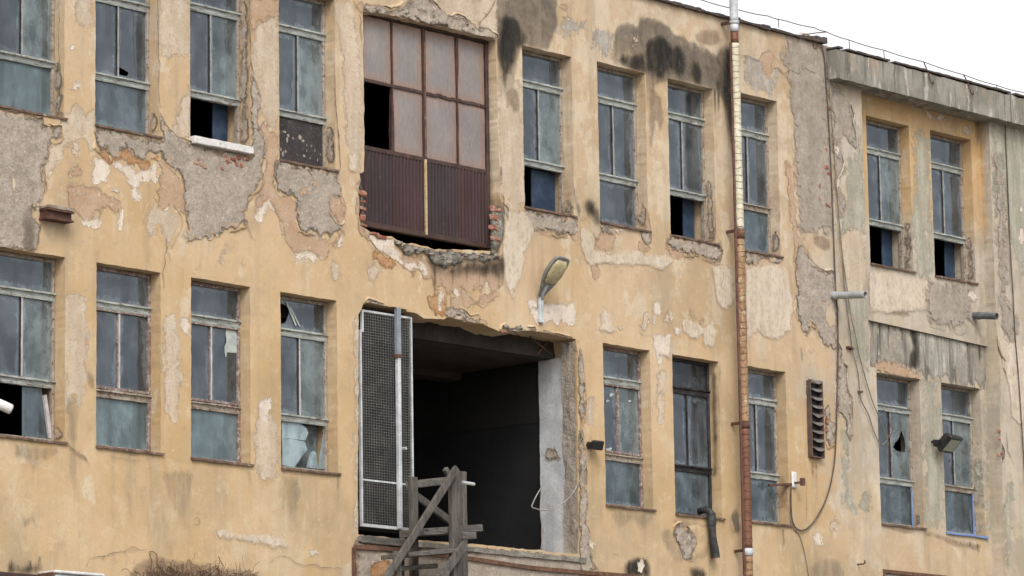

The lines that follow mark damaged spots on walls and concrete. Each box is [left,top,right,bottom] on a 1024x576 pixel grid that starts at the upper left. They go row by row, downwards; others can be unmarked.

damp [497,0,558,109]
damp [615,18,731,131]
flaking render [0,0,597,576]
flaking render [665,180,722,265]
peeling [743,33,867,449]
flaking render [673,520,698,560]